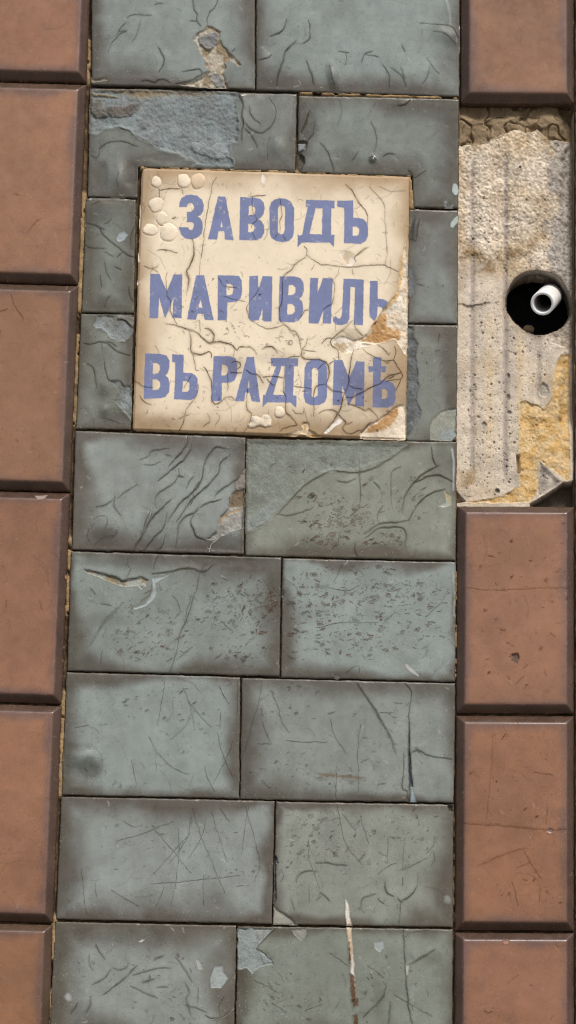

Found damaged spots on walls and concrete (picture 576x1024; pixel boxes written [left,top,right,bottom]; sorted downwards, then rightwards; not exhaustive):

spalling [89,25,242,171]
peeling [204,107,574,541]
crack [84,110,426,673]
crack [276,444,453,556]
spalling [83,569,171,611]
crack [357,683,451,801]
peeling [255,906,308,965]